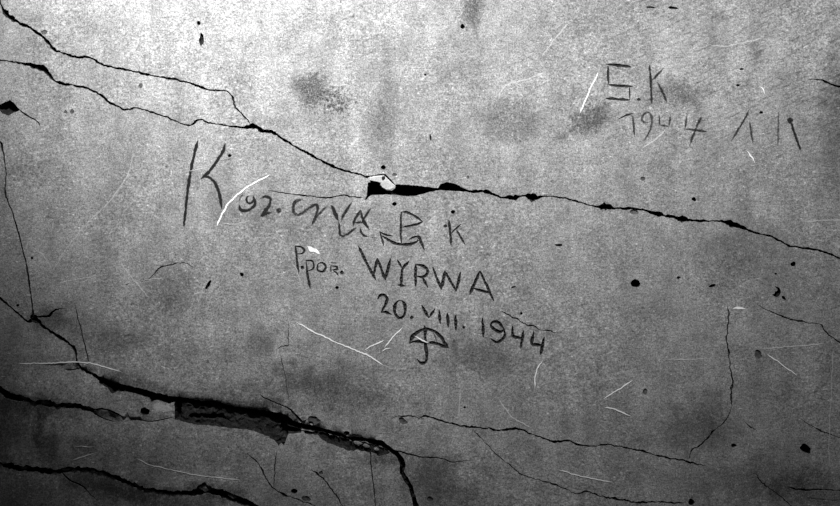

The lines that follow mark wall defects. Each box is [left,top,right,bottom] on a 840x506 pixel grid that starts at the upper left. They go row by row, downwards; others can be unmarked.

crack [0,0,840,259]
flaking render [370,165,397,191]
crack [0,141,193,422]
flaking render [174,398,390,456]
crack [259,323,468,506]
crack [392,307,757,504]
crack [0,462,259,506]
crack [248,452,315,506]
crack [755,473,840,506]